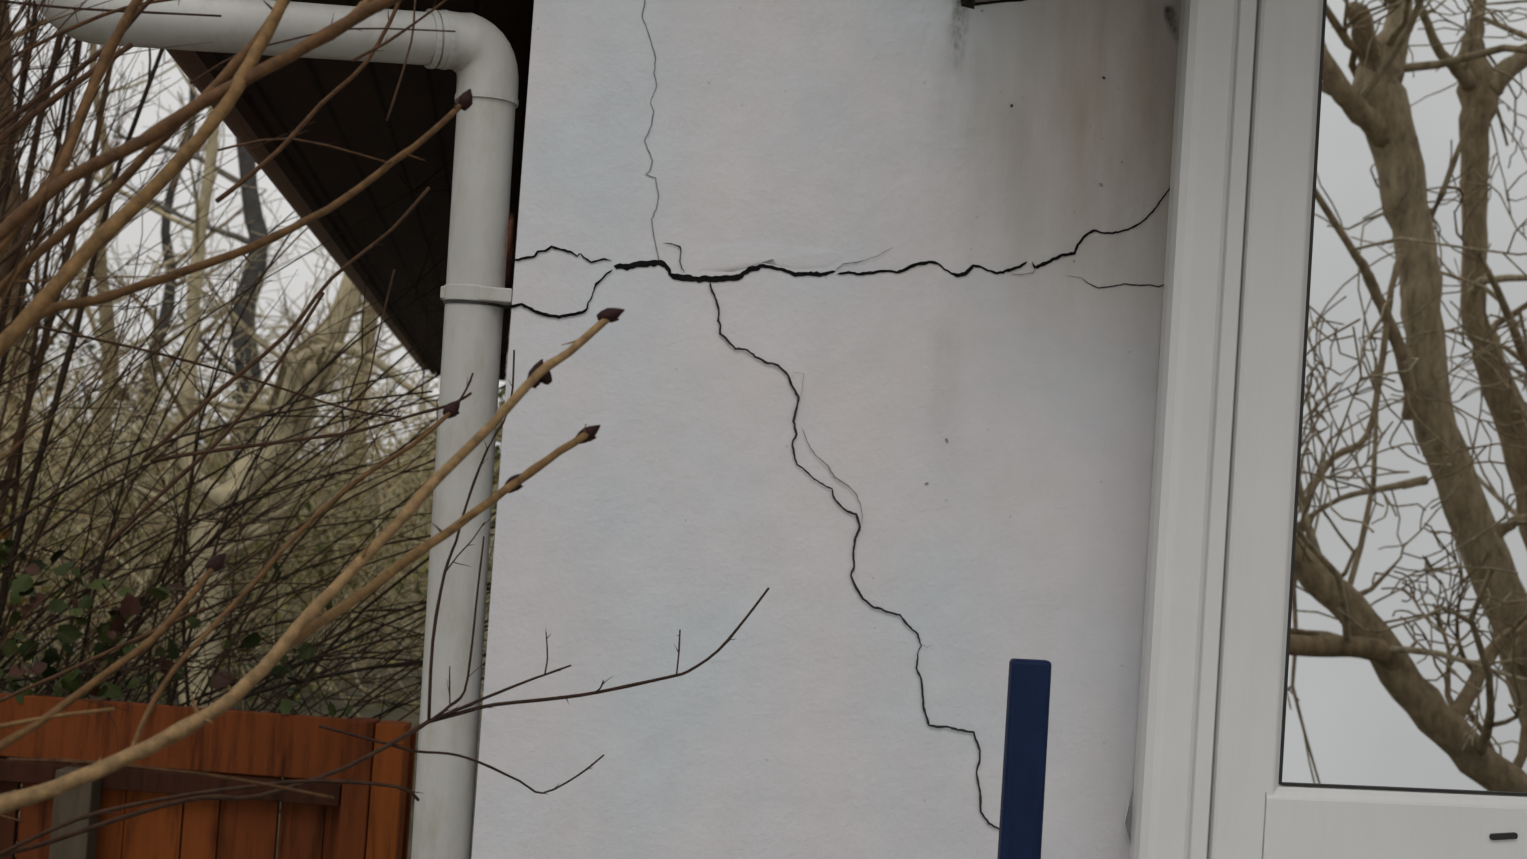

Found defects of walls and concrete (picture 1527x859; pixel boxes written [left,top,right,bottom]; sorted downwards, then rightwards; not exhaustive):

crack [501,0,1170,830]